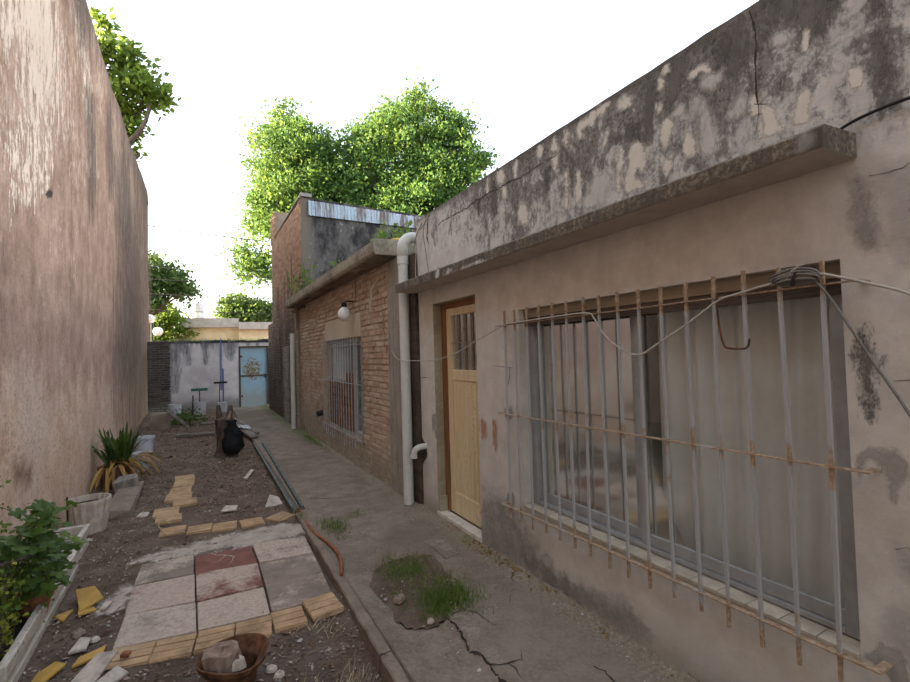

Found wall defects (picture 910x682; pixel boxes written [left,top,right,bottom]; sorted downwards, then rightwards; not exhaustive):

peeling [0,0,96,229]
water stain [611,54,689,146]
crack [746,11,784,141]
water stain [705,0,833,81]
crack [419,132,590,243]
water stain [850,328,884,423]
crack [446,586,523,682]